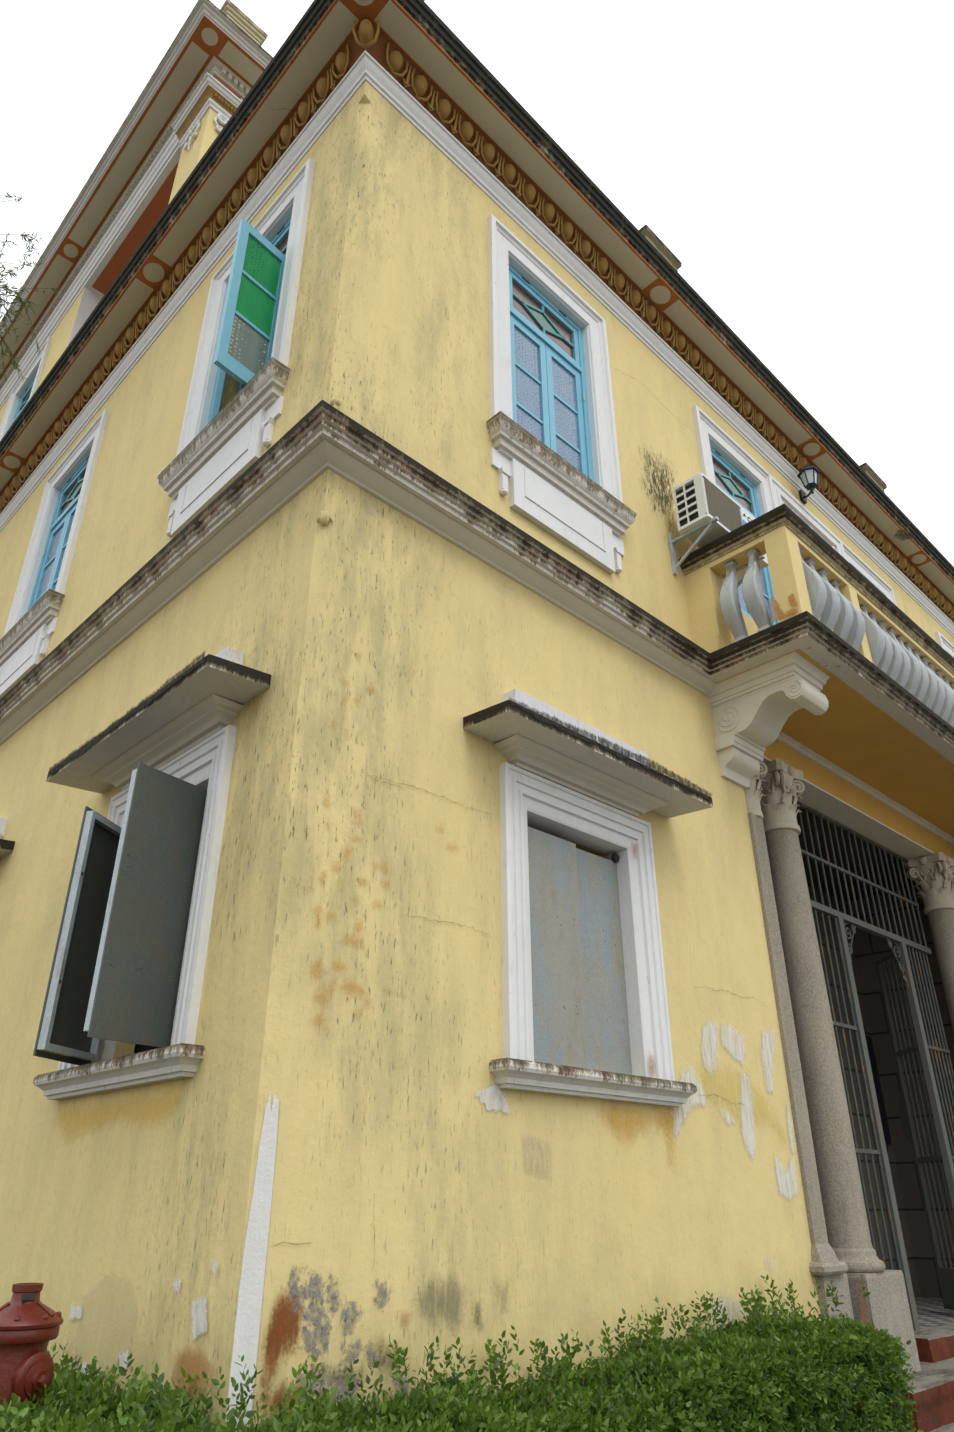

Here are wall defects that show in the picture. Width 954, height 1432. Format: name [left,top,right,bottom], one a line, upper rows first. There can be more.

water stain [644,455,673,513]
peeling [673,1021,774,1159]
peeling [775,1106,798,1199]
rust [263,1296,299,1411]
flaking render [288,1268,409,1403]